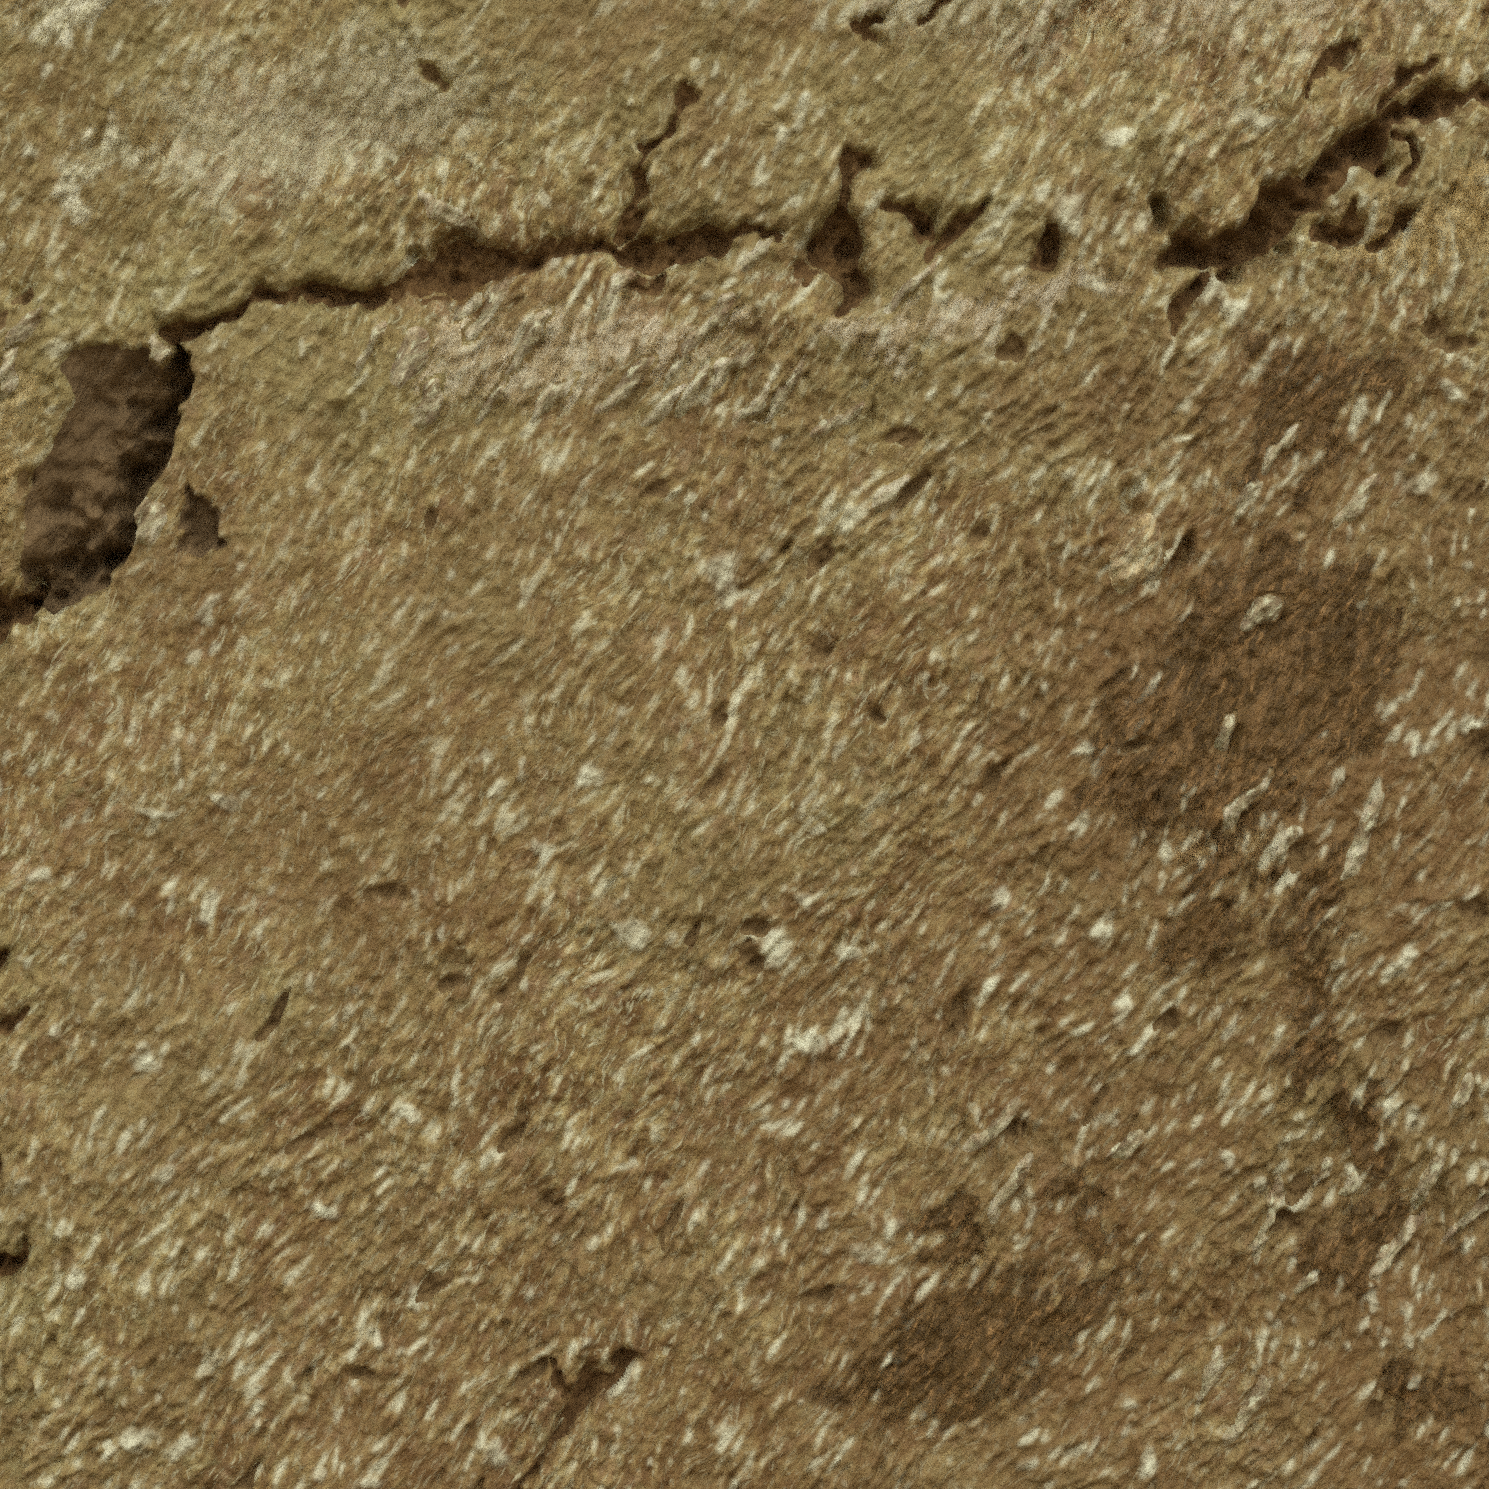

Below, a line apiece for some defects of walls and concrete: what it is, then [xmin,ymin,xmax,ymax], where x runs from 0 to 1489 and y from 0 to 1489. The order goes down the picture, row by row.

crack [1305,41,1357,99]
crack [158,81,986,345]
crack [1157,57,1489,337]
crack [1029,223,1060,272]
peeling [148,333,173,365]
spalling [134,484,227,558]
crack [0,584,47,645]
crack [0,949,8,968]
crack [0,1006,30,1036]
crack [0,1240,29,1277]